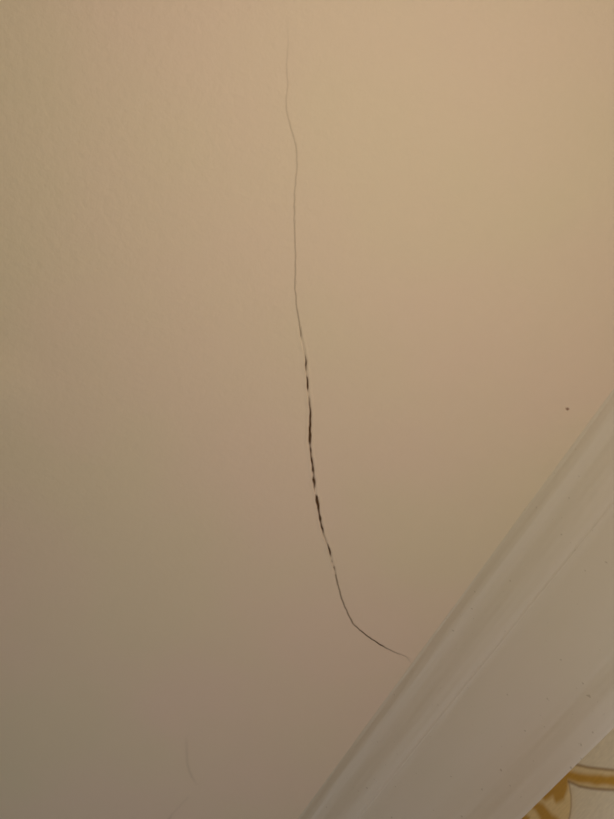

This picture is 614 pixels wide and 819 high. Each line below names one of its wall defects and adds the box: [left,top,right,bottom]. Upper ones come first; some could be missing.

crack [296,326,339,575]